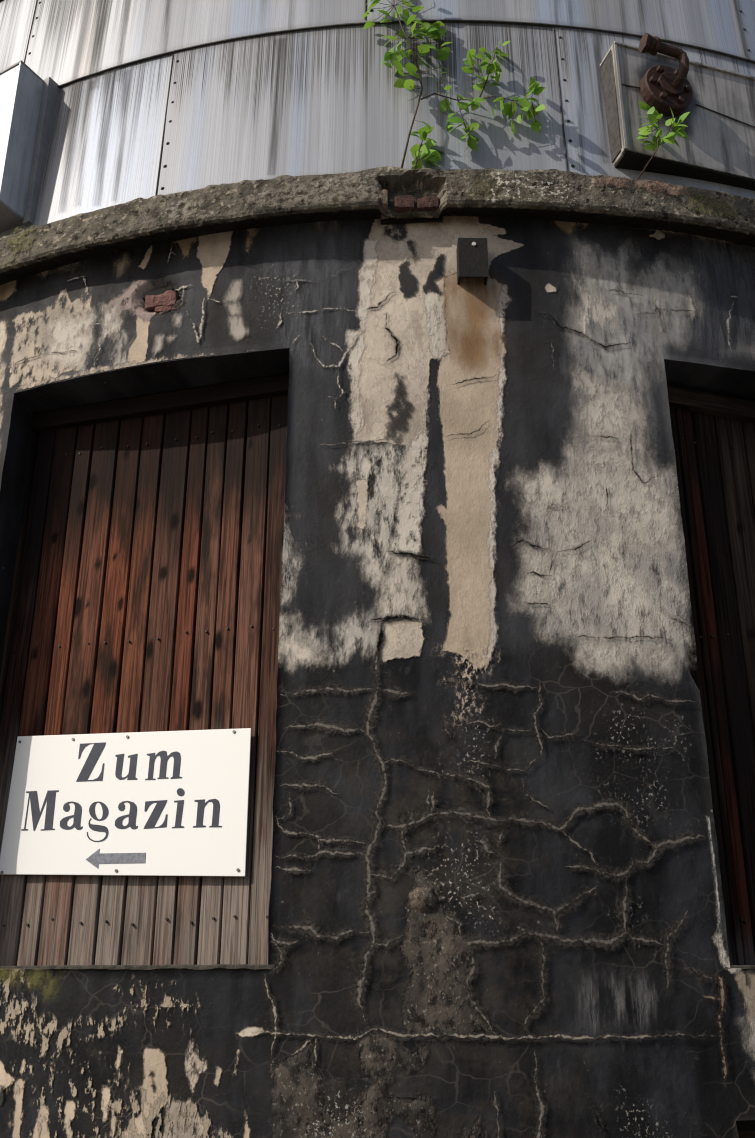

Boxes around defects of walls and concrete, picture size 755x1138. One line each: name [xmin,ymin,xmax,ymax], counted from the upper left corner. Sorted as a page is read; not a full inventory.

peeling [0,246,206,427]
spalling [157,195,207,222]
peeling [174,231,233,297]
crack [277,269,399,405]
peeling [514,221,703,677]
crack [250,615,727,1138]
peeling [0,969,264,1138]
spalling [269,869,501,1138]
peeling [734,971,755,1051]